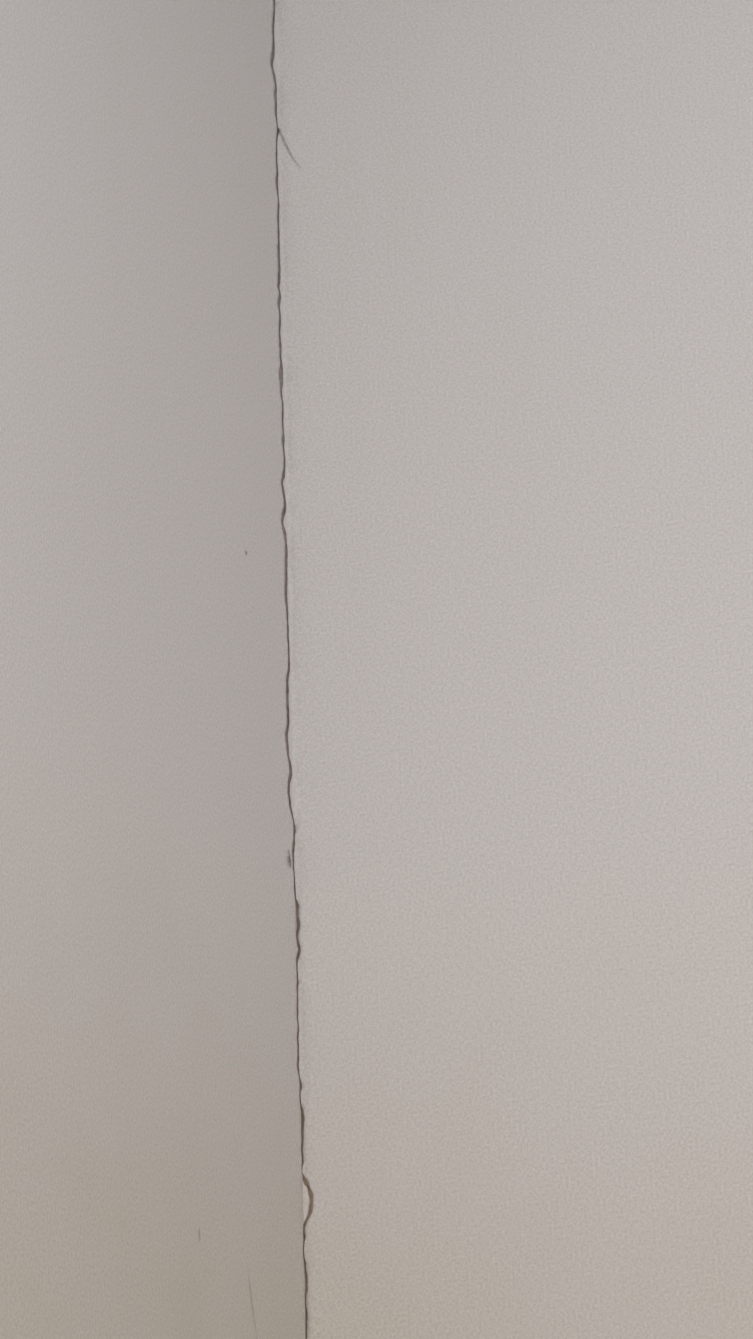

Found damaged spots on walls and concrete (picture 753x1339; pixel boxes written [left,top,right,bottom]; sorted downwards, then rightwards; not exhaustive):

crack [271,0,314,1339]